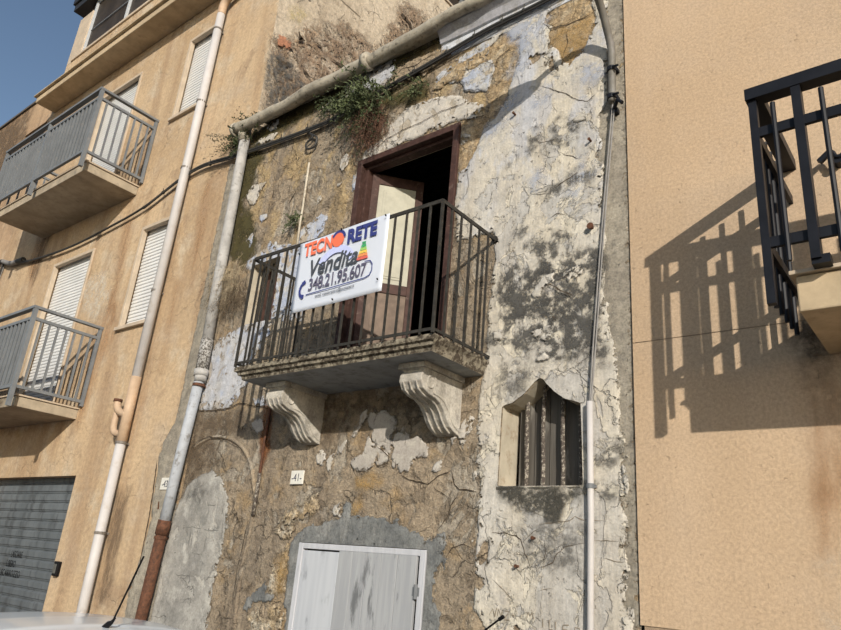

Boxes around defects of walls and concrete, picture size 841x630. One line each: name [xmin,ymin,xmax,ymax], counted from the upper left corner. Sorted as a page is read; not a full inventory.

spalling [530,0,596,71]
leakage [265,51,305,106]
spalling [342,20,531,171]
peeling [255,119,279,145]
peeling [247,182,266,205]
leakage [486,229,607,359]
peeling [531,264,583,299]
peeling [531,325,551,341]
peeling [316,409,429,473]
peeling [450,415,475,449]
spalling [474,539,492,590]
crack [492,516,625,568]